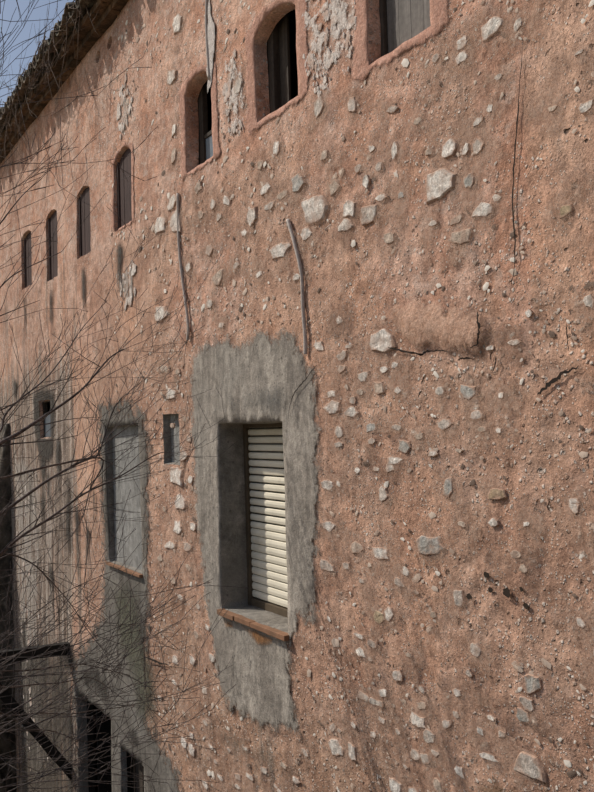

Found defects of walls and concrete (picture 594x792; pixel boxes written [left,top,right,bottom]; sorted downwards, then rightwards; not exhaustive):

crack [508,60,522,299]
crack [388,312,481,360]
crack [538,324,579,394]